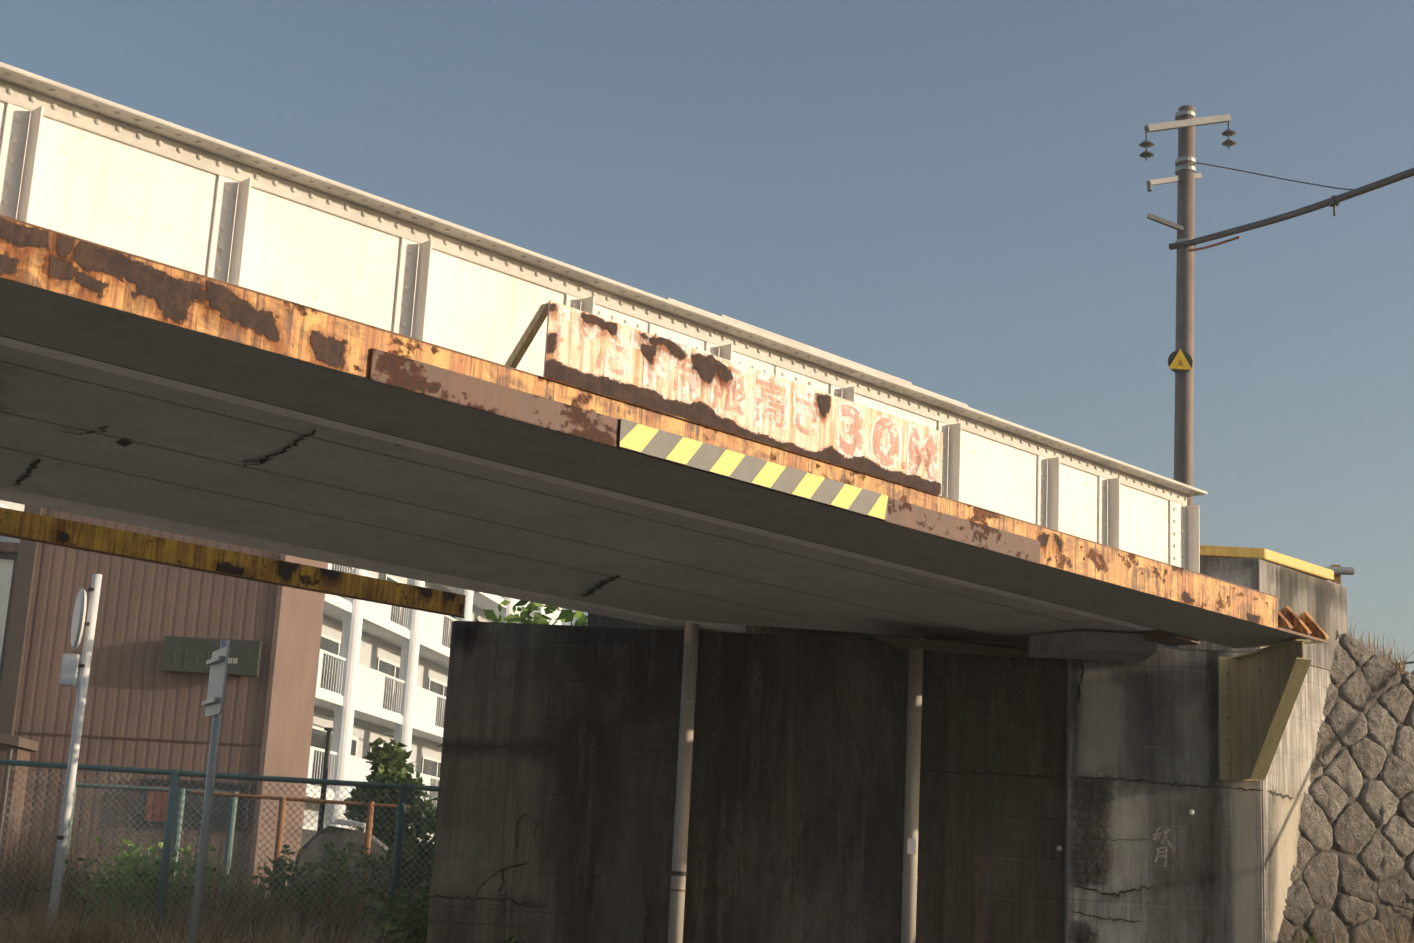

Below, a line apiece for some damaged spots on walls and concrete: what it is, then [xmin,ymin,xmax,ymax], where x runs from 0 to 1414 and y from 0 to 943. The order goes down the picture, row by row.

rust [0,217,283,349]
rust [310,330,348,370]
rust [546,303,941,495]
rust [1038,532,1063,554]
rust [275,560,300,583]
rust [317,567,341,587]
rust [417,586,463,614]
leakage [453,621,478,652]
leakage [511,626,675,943]
leakage [682,631,1304,943]
crack [429,814,545,916]
crack [1071,882,1154,923]